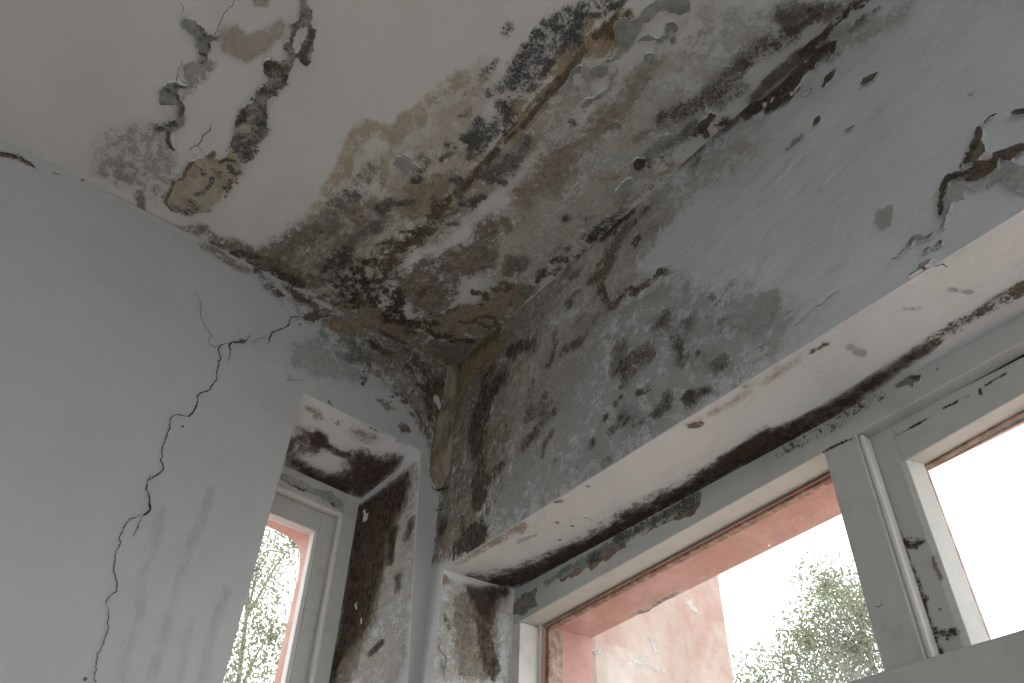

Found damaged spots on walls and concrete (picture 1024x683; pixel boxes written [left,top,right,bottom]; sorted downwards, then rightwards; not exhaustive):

leakage [98,127,174,210]
peeling [148,79,188,151]
spalling [164,0,317,216]
peeling [558,0,691,127]
peeling [615,156,663,201]
spalling [680,40,840,172]
spalling [890,113,1024,279]
leakage [178,0,909,683]
crack [83,292,300,682]
leakage [433,280,1024,683]
peeling [513,492,702,618]